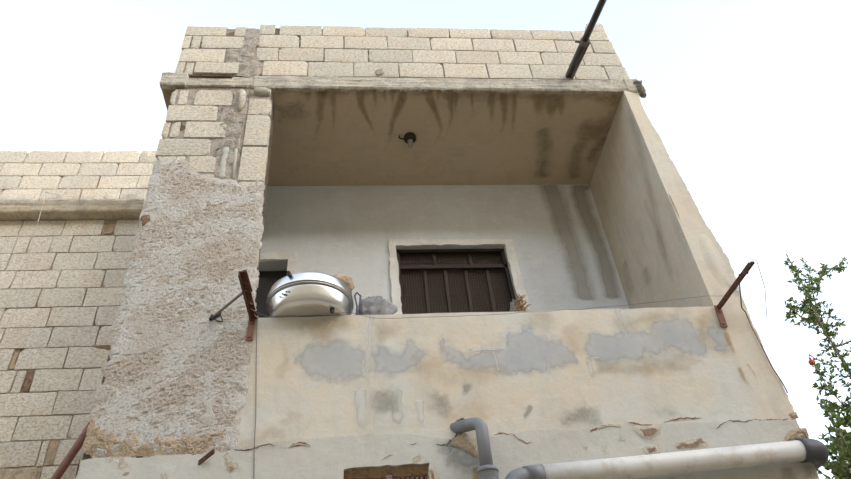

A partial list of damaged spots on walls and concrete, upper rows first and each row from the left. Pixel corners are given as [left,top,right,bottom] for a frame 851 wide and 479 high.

leakage [539,130,591,299]
flaking render [82,156,265,476]
crack [590,417,699,432]
crack [716,418,788,429]
flaking render [635,425,659,454]
flaking render [677,438,707,449]